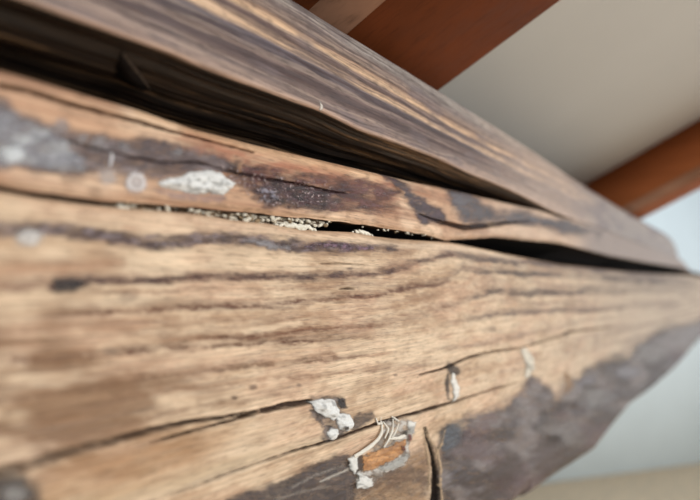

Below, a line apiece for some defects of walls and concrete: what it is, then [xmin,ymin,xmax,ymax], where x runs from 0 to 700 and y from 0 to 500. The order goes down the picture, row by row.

damp [0,100,446,224]
crack [0,187,685,275]
crack [0,399,309,474]
crack [268,397,466,500]
crack [419,350,501,375]
damp [228,321,700,500]